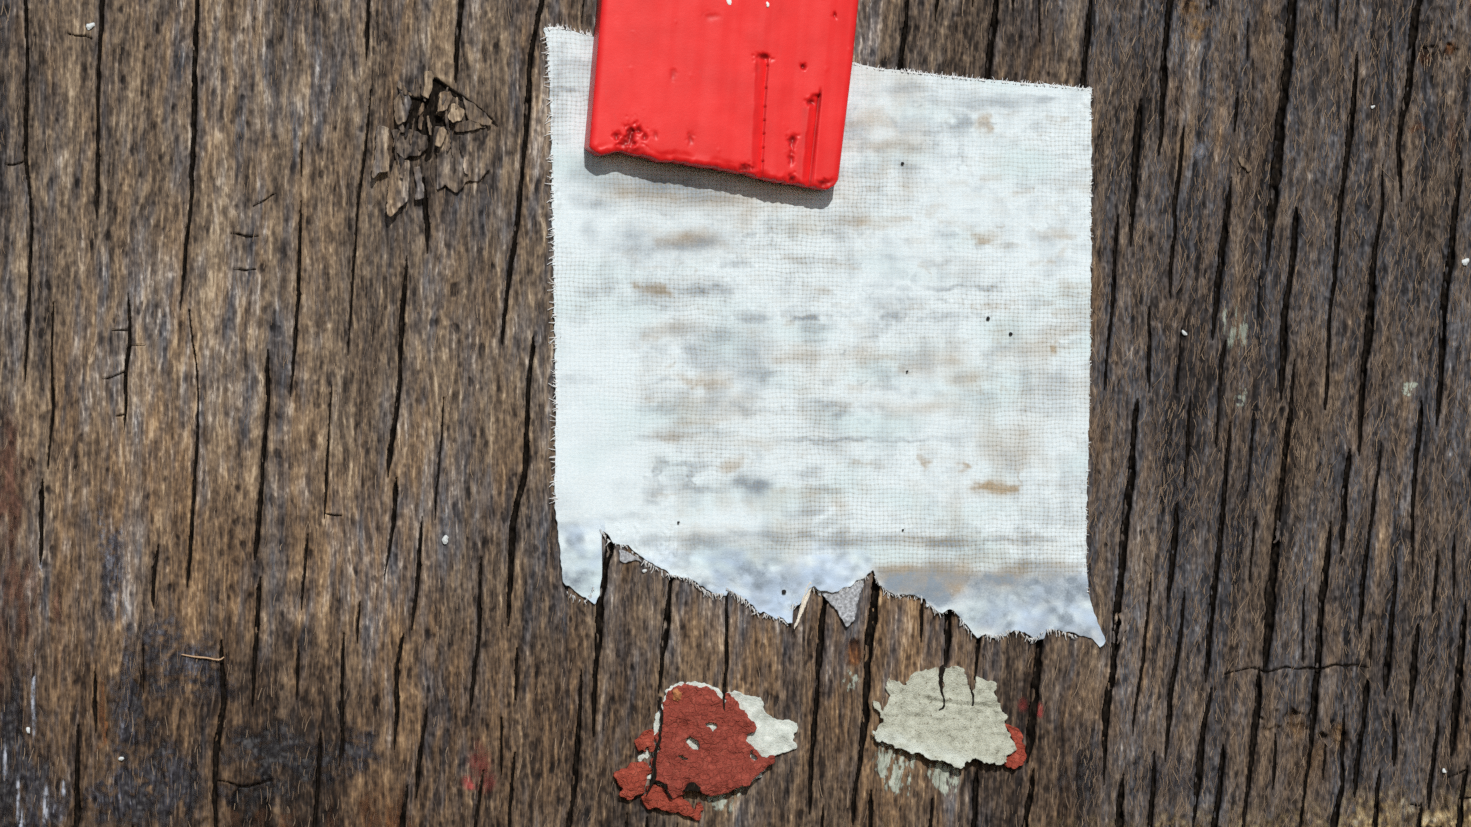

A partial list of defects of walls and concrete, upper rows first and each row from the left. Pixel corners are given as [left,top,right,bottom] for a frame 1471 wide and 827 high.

crack [151,0,199,609]
crack [213,143,303,827]
crack [301,385,342,610]
crack [470,0,545,827]
peeling [613,681,798,820]
peeling [872,658,1027,769]
crack [1102,0,1471,827]